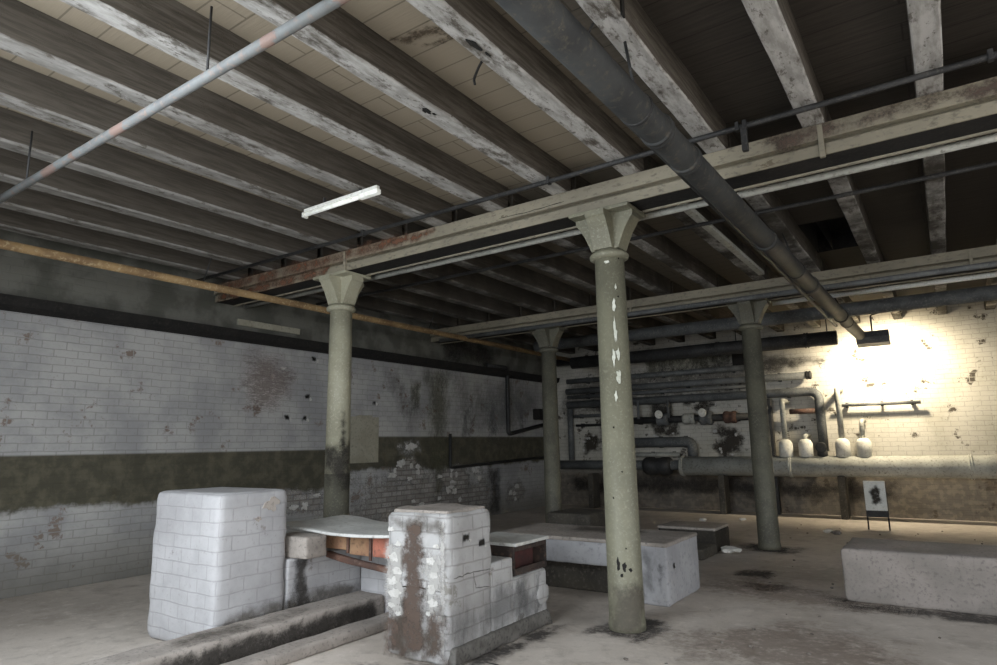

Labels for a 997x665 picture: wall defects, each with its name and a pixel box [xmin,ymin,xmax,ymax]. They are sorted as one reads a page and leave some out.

rust [219,230,435,300]
leakage [386,599,416,656]